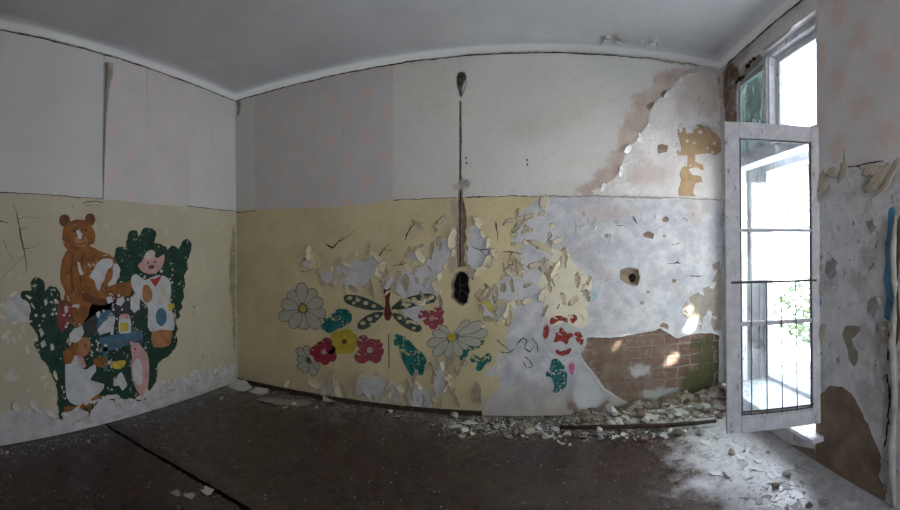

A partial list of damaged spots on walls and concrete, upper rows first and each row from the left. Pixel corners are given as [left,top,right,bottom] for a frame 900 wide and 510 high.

peeling [592,71,722,197]
crack [0,192,103,277]
peeling [0,258,140,364]
peeling [0,360,239,446]
peeling [283,353,468,414]
spalling [295,194,722,404]
spalling [790,206,900,509]